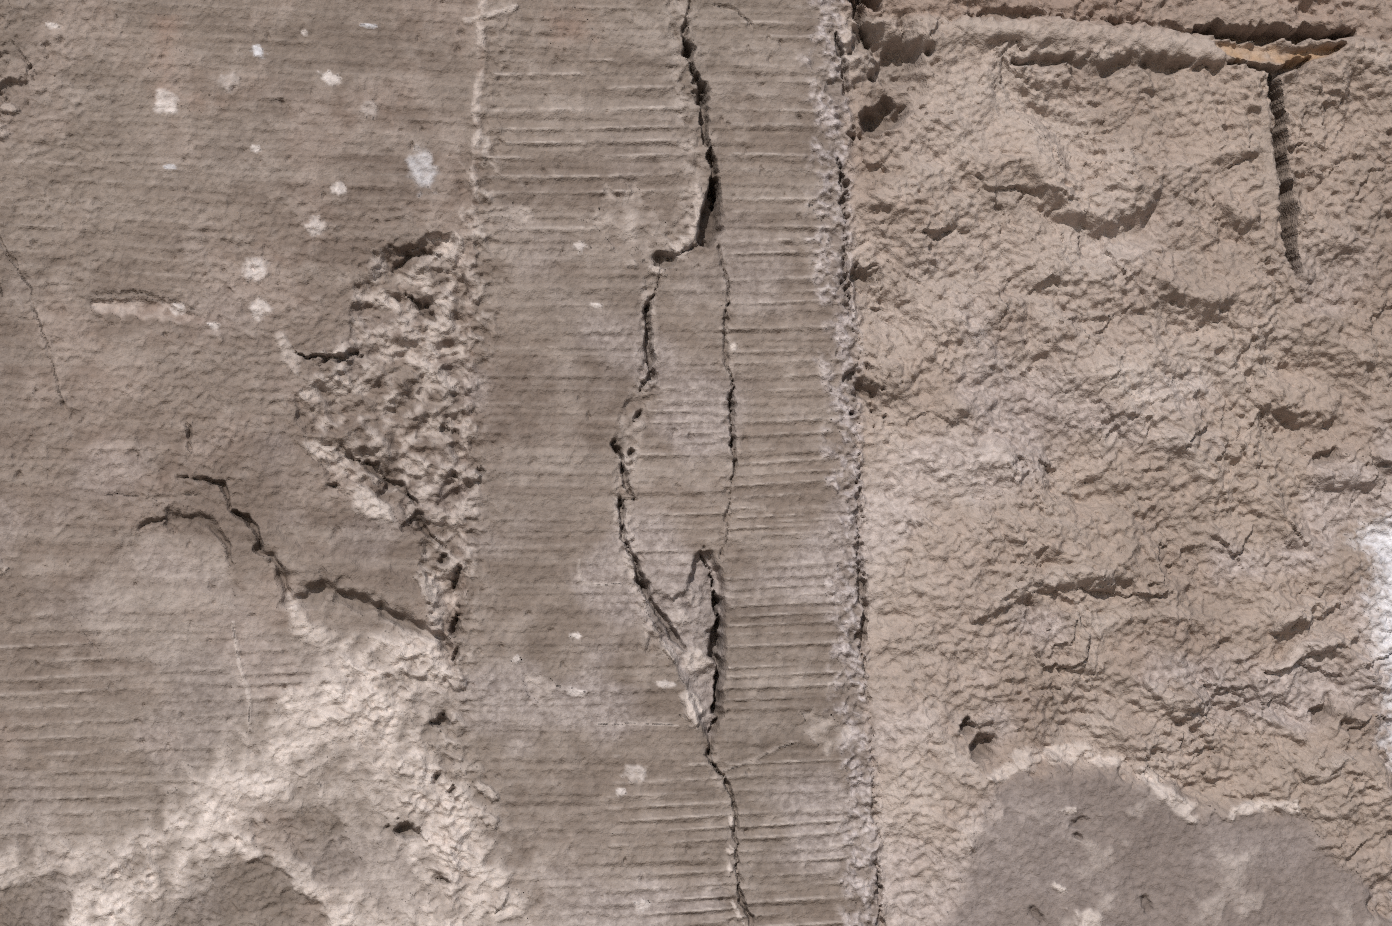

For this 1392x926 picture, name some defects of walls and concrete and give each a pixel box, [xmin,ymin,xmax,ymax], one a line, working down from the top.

crack [681,2,721,196]
crack [1263,69,1302,276]
crack [119,424,453,653]
spalling [295,234,487,692]
crack [611,438,660,632]
crack [638,280,658,393]
crack [689,245,738,559]
crack [705,736,753,926]